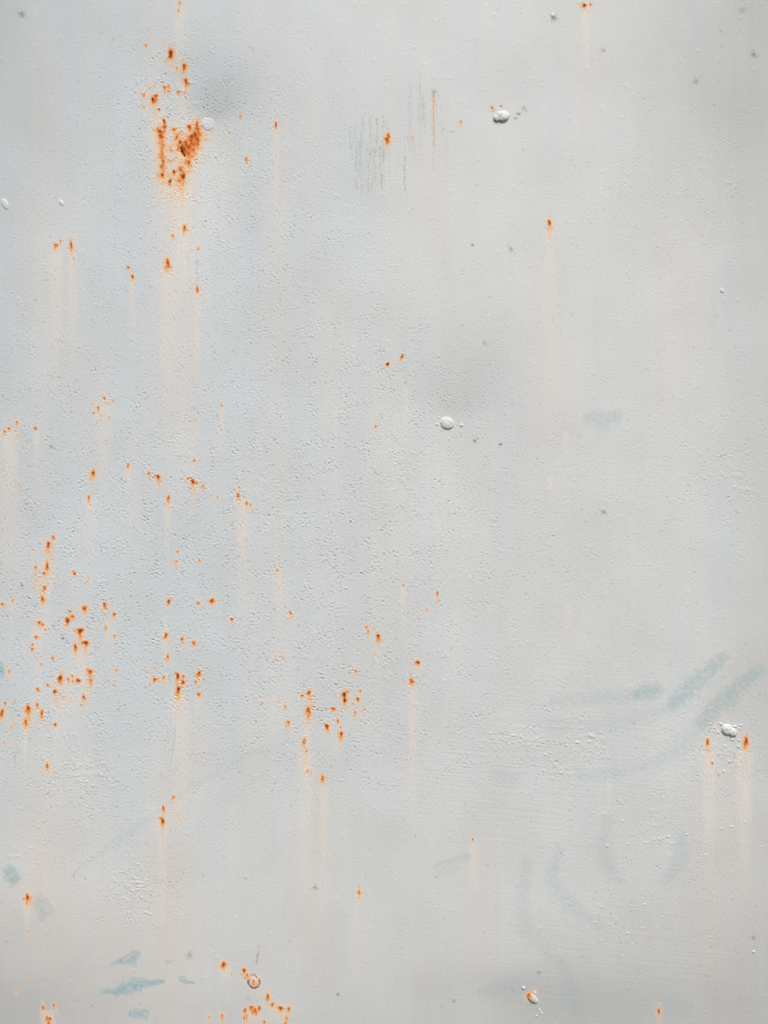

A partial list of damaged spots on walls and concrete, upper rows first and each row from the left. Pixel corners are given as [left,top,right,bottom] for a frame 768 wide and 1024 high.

corrosion [118,40,252,329]
corrosion [382,351,407,372]
corrosion [123,458,166,500]
corrosion [183,472,227,520]
corrosion [0,531,122,784]
corrosion [141,593,208,820]
corrosion [260,623,387,772]
corrosion [411,657,424,676]
corrosion [204,955,296,1024]
corrosion [522,987,540,1007]